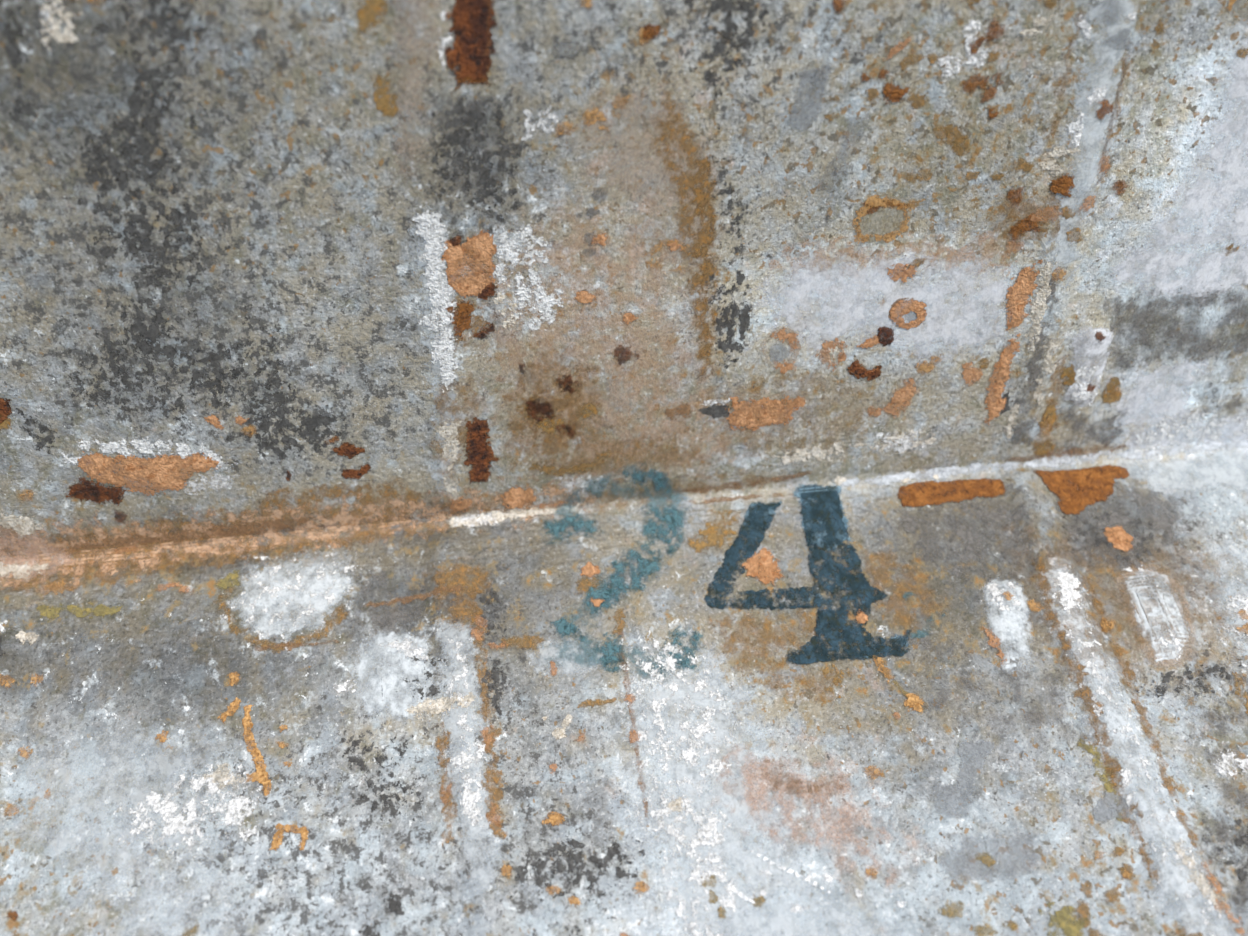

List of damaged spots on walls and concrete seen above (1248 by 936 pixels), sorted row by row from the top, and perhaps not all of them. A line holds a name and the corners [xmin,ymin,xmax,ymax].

rust [438,0,497,90]
rust [963,18,1005,119]
rust [441,230,498,342]
rust [816,298,927,381]
rust [833,159,1096,425]
rust [1103,377,1122,404]
rust [0,386,611,621]
rust [897,478,1037,587]
rust [1010,405,1187,571]
leakage [219,546,385,651]
leakage [479,590,507,637]
leakage [482,657,507,715]